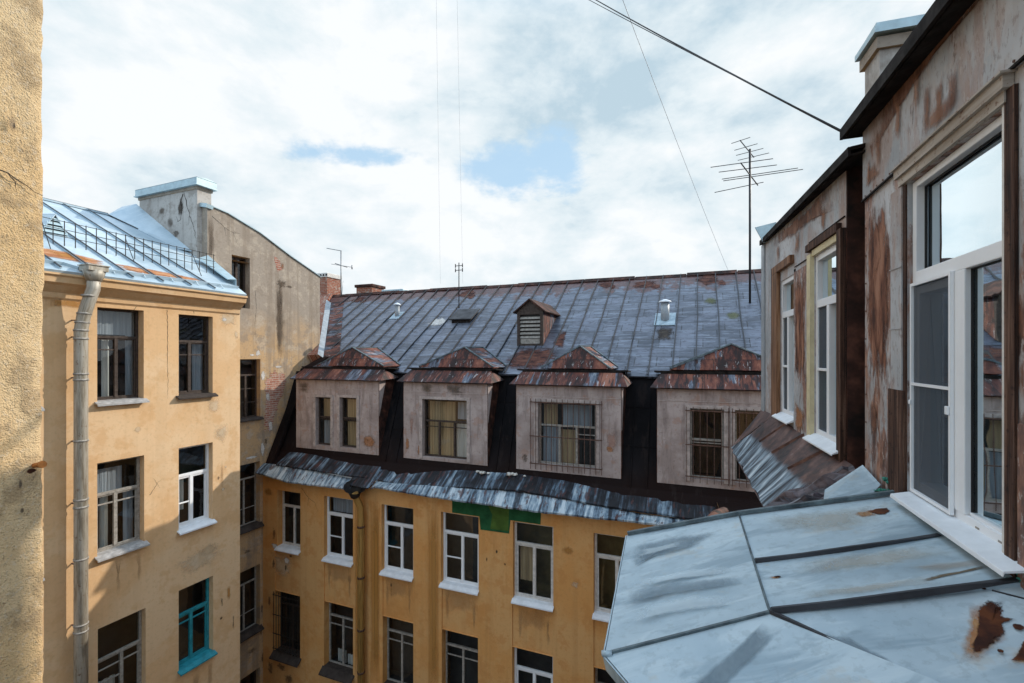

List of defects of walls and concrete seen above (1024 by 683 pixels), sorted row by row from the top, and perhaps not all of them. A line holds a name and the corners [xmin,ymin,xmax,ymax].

corrosion [867,2,975,184]
crack [176,194,240,247]
corrosion [505,332,566,369]
corrosion [794,283,805,370]
flaking render [246,366,286,459]
corrosion [858,508,890,516]
corrosion [967,588,1024,661]